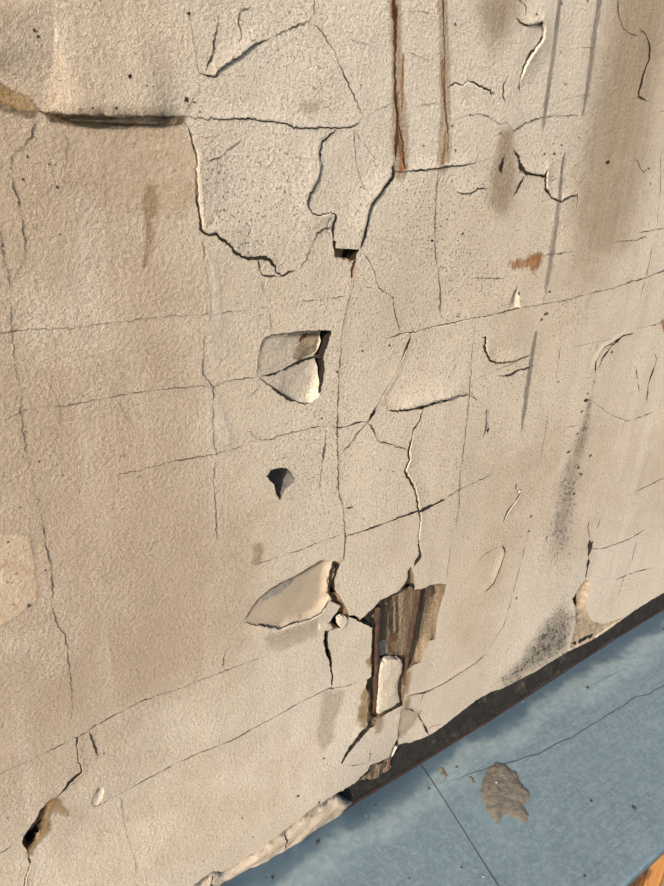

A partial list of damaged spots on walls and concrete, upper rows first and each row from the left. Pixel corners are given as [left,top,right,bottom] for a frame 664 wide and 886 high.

crack [617,0,664,112]
crack [592,152,664,306]
crack [0,0,586,800]
spalling [256,330,331,405]
crack [556,321,663,421]
hole [267,468,295,500]
spalling [245,560,332,627]
crack [585,518,654,598]
spalling [357,567,446,727]
flaking render [360,739,399,780]
crack [0,846,39,886]
hole [22,799,53,853]